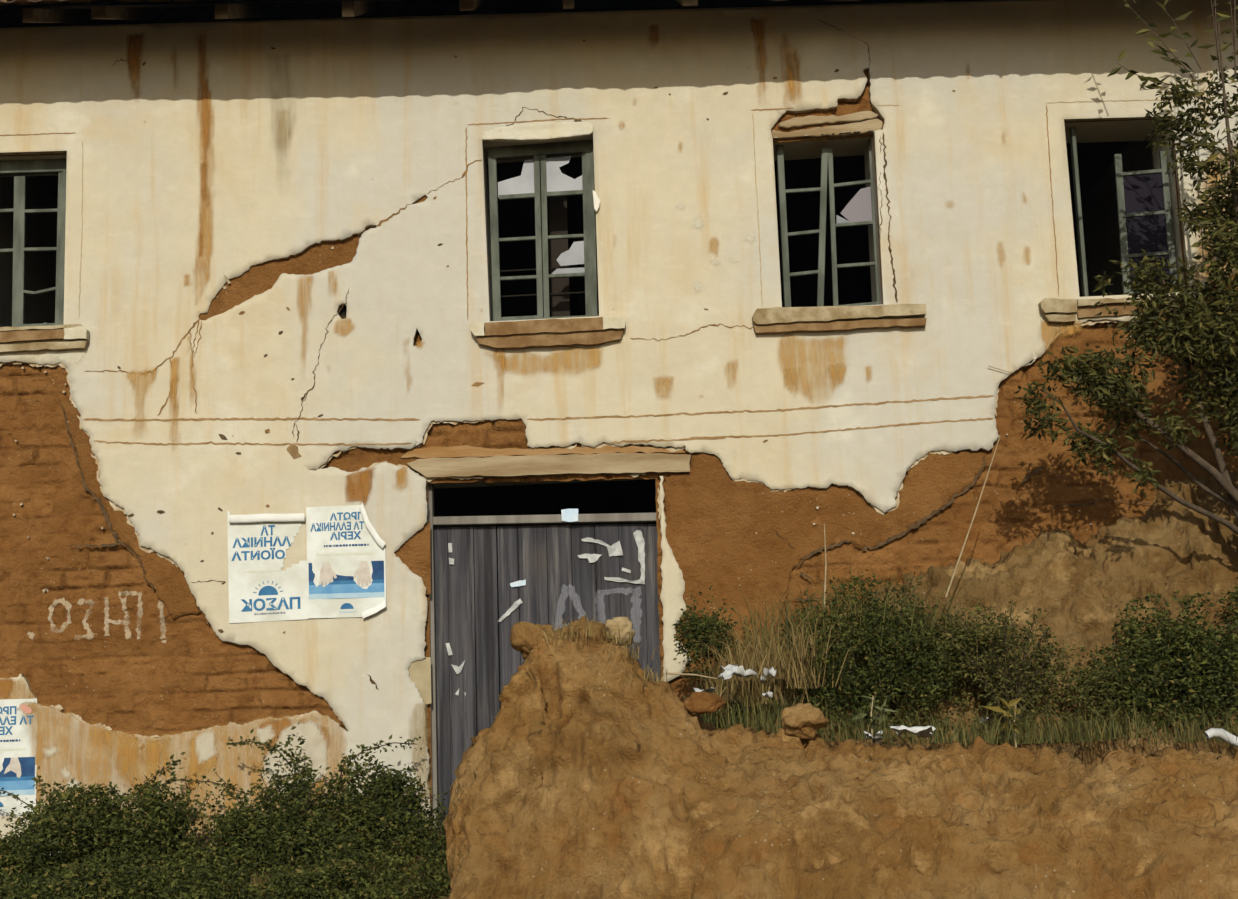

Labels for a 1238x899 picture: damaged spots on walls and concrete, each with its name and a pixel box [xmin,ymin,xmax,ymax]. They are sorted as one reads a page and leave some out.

flaking render [771,71,884,143]
flaking render [199,227,376,320]
crack [292,289,349,441]
crack [377,160,480,226]
crack [631,324,752,342]
crack [878,133,898,302]
flaking render [0,362,348,750]
flaking render [315,276,1238,715]